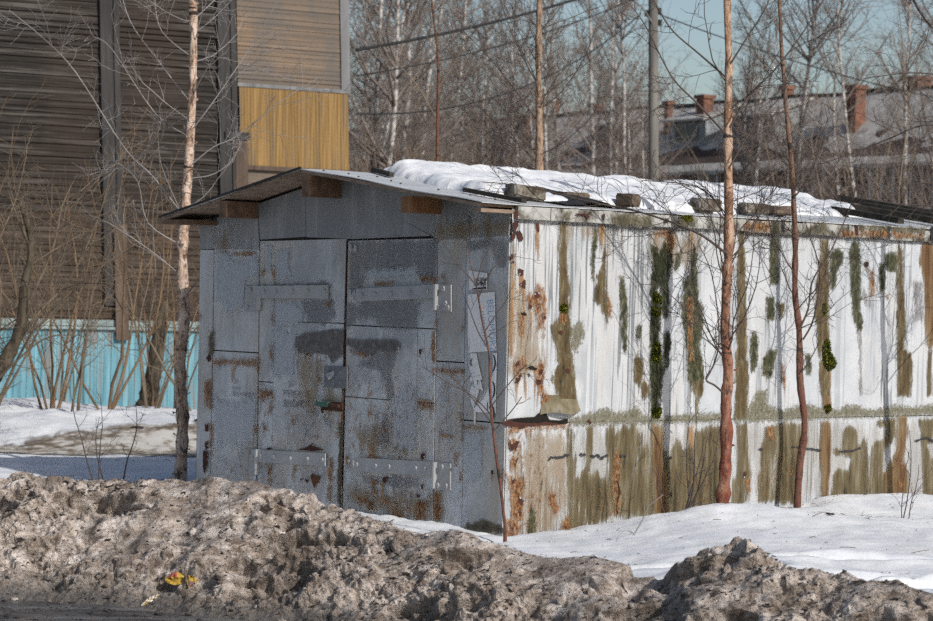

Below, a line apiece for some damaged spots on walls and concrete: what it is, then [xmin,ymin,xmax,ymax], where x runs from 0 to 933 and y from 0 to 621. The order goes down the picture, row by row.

corrosion [337,320,486,482]
corrosion [507,263,551,407]
leakage [913,281,924,323]
corrosion [267,455,443,522]